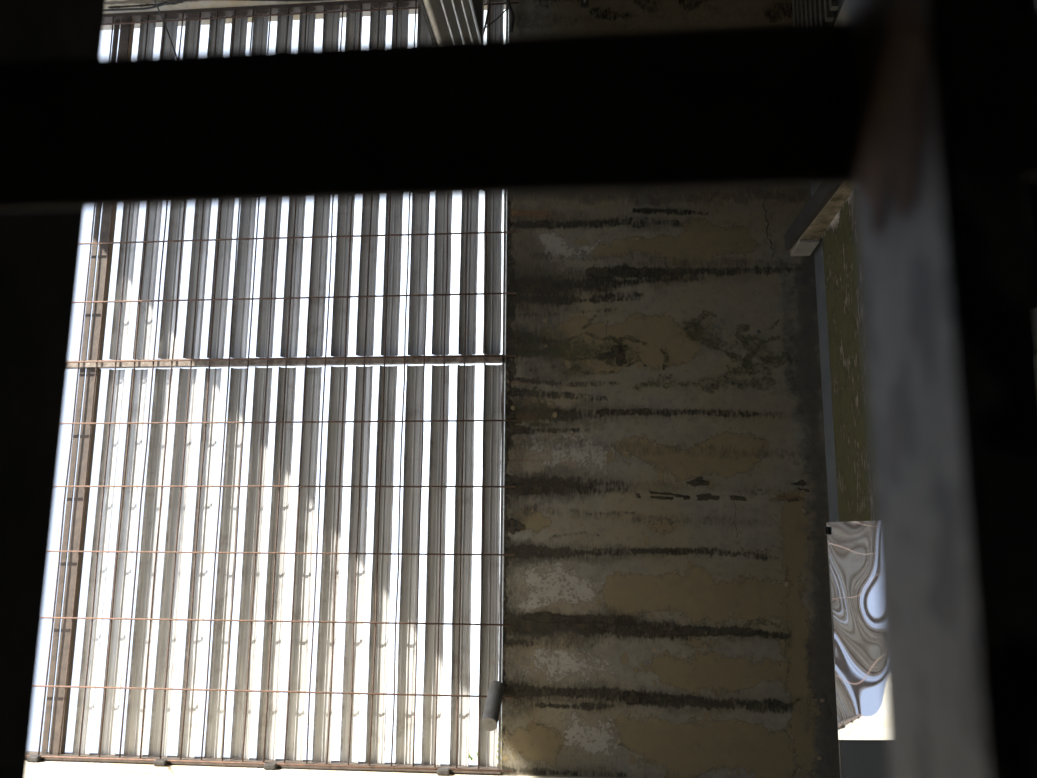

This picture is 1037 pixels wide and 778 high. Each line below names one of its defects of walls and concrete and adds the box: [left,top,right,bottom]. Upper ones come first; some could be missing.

peeling [525,425,620,477]
leakage [502,200,841,778]
spalling [636,477,747,501]
peeling [511,556,606,617]
peeling [514,641,618,688]